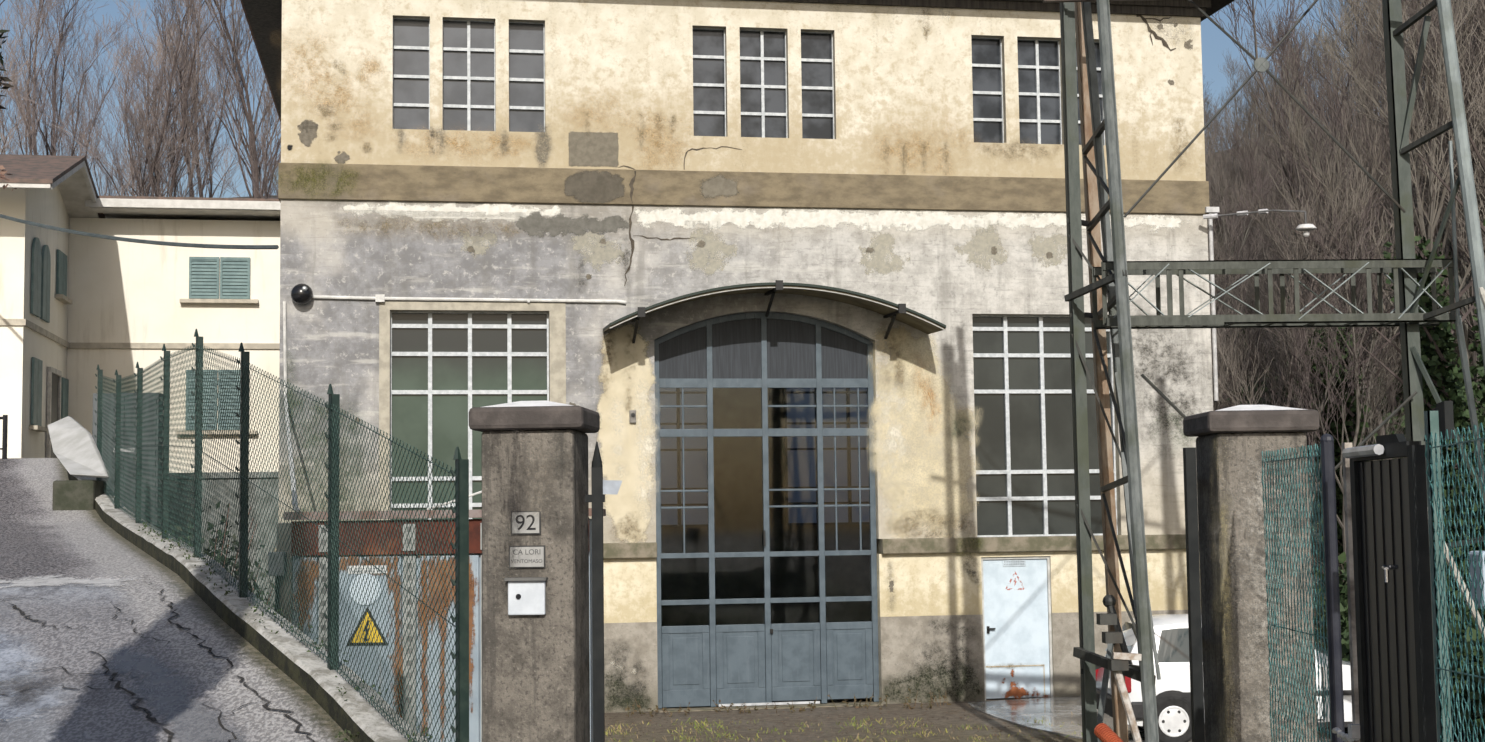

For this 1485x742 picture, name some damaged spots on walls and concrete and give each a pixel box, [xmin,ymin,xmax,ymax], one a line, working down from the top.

crack [1136,15,1176,51]
spalling [298,109,369,164]
crack [684,146,742,170]
crack [618,165,695,286]
peeling [343,171,1183,259]
rust [293,558,319,630]
rust [339,555,479,741]
rust [1002,665,1048,699]